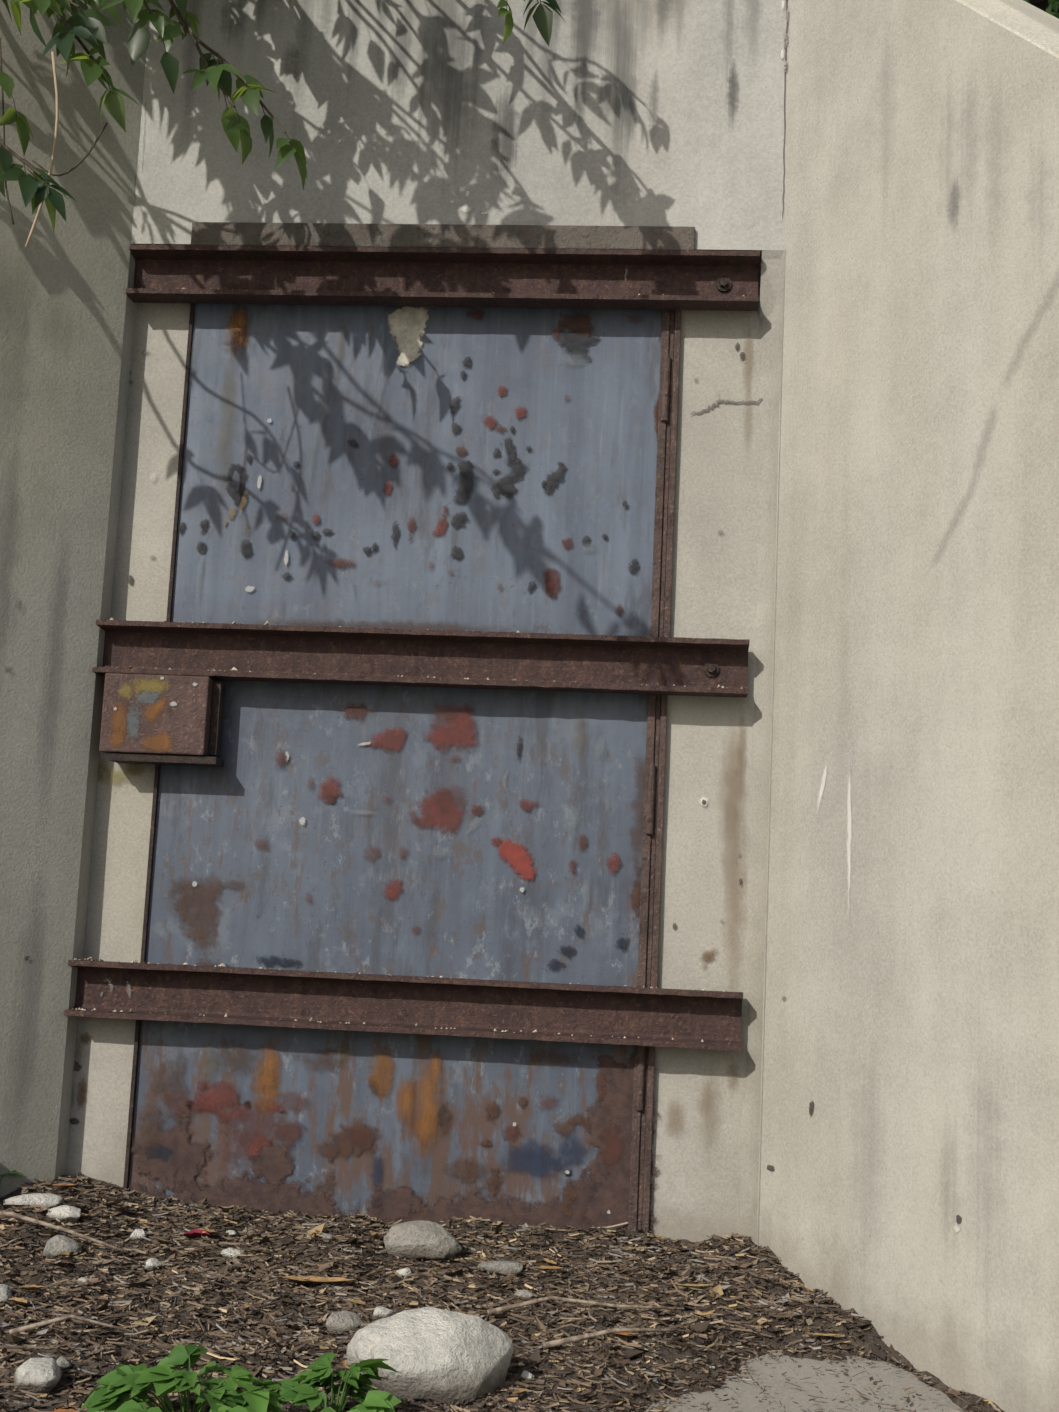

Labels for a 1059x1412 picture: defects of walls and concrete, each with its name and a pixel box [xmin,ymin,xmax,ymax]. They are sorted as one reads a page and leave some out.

damp [577,0,592,57]
damp [496,104,514,158]
crack [781,0,789,219]
peeling [387,306,429,366]
crack [690,399,763,415]
peeling [447,396,473,528]
peeling [491,426,531,498]
peeling [178,454,262,554]
corrosion [369,728,406,751]
corrosion [426,705,476,749]
corrosion [384,880,402,900]
corrosion [127,1046,659,1233]